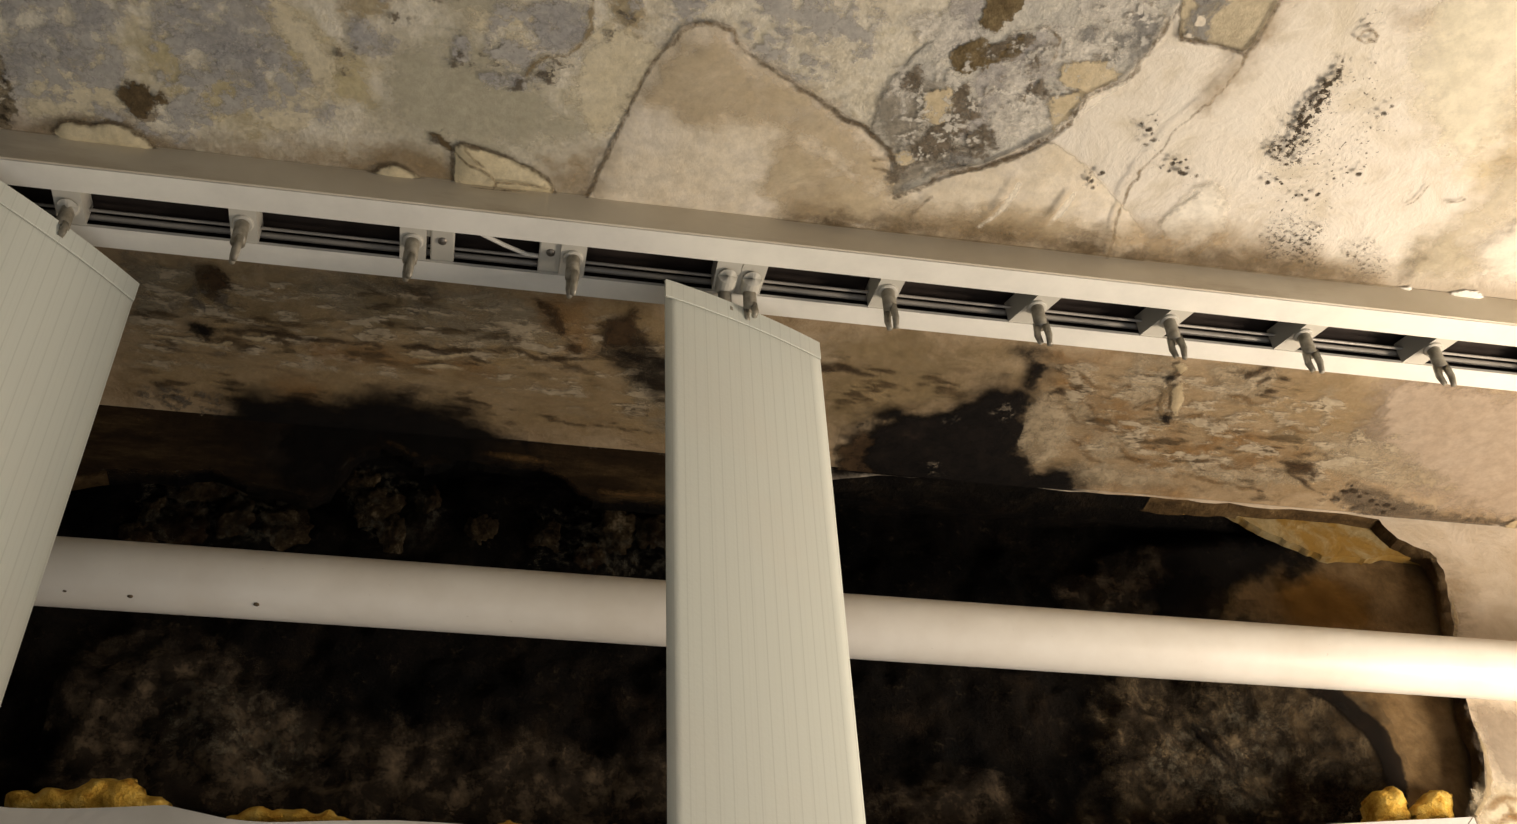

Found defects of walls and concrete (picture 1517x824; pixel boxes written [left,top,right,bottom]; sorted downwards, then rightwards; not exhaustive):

crack [587,7,1181,215]
water stain [1075,56,1395,280]
water stain [76,252,666,504]
flaking render [56,447,666,580]
flaking render [832,363,1454,637]
flaking render [0,590,667,824]
flaking render [850,659,1486,824]